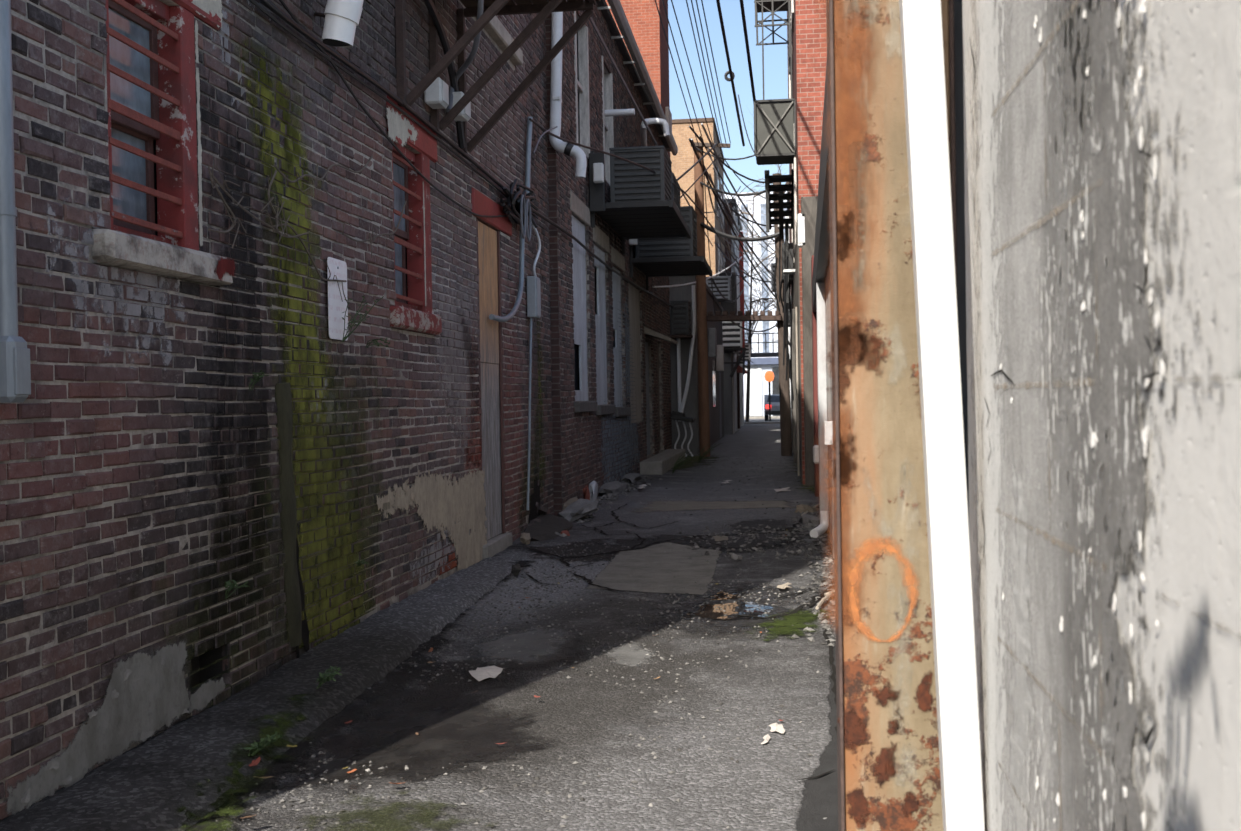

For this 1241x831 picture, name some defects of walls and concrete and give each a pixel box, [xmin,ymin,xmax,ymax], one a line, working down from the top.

peeling [386,105,418,147]
leakage [187,41,380,688]
rust [826,0,884,622]
peeling [966,0,1234,831]
peeling [373,439,487,576]
peeling [6,640,225,815]
rust [838,706,866,750]
rust [846,682,905,824]
rust [902,791,920,817]
rust [914,672,933,712]